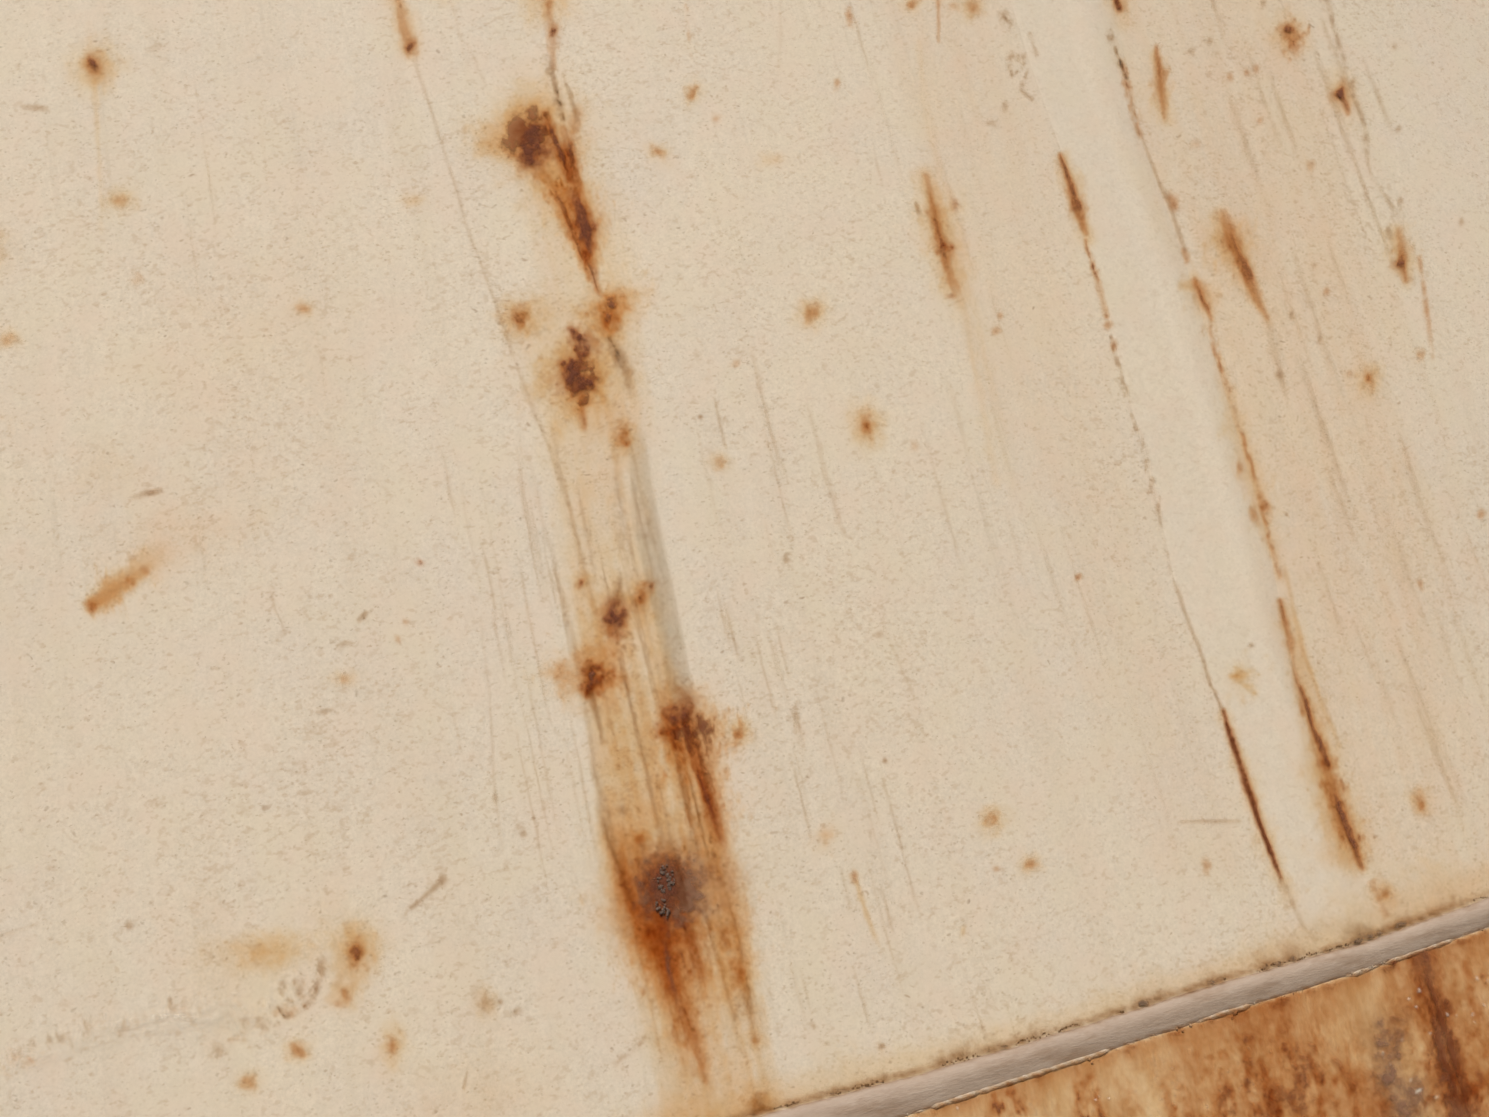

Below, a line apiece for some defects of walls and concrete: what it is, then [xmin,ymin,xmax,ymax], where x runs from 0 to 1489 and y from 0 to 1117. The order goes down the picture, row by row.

corrosion [502,106,573,165]
corrosion [565,203,591,245]
corrosion [562,329,598,404]
corrosion [673,712,714,761]
corrosion [1337,801,1357,849]
corrosion [639,859,704,921]
corrosion [1377,951,1473,1117]